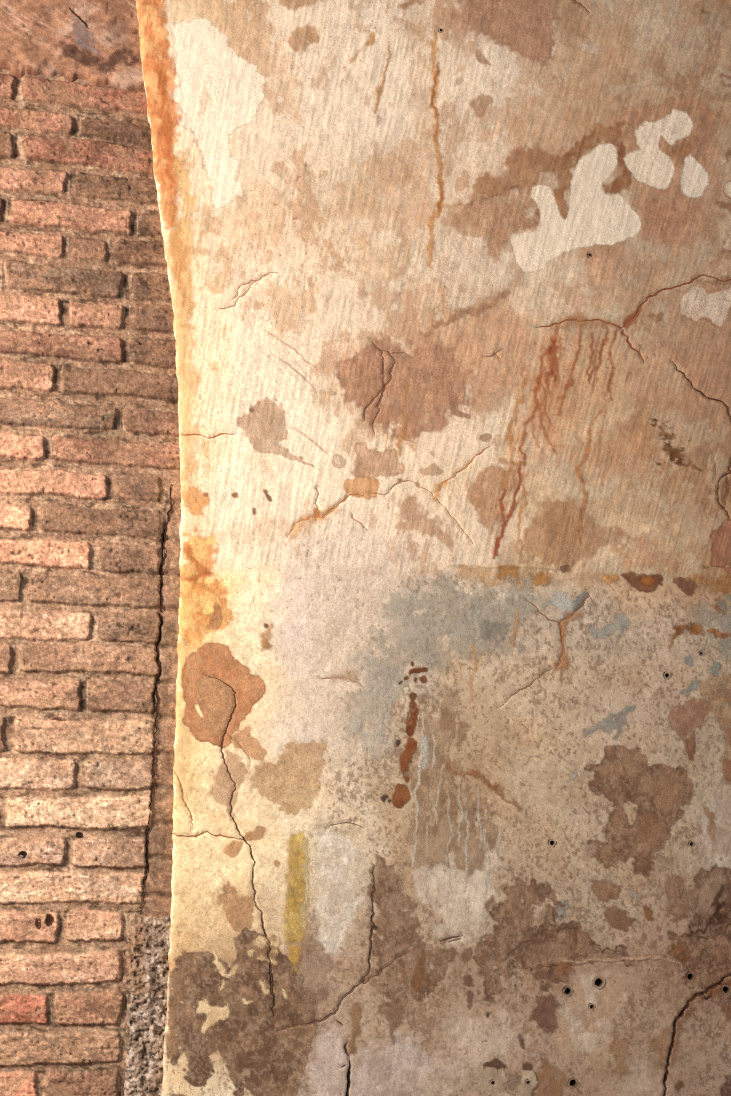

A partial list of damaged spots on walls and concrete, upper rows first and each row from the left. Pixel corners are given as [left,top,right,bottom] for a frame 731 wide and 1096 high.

peeling [170,17,265,209]
crack [363,341,409,432]
rust [427,29,444,268]
rust [457,324,617,589]
peeling [423,102,708,336]
crack [540,274,731,360]
peeling [680,181,731,328]
crack [139,484,406,1096]
rust [381,662,427,808]
spalling [122,839,332,1096]
spalling [348,1002,361,1054]
crack [663,974,731,1096]